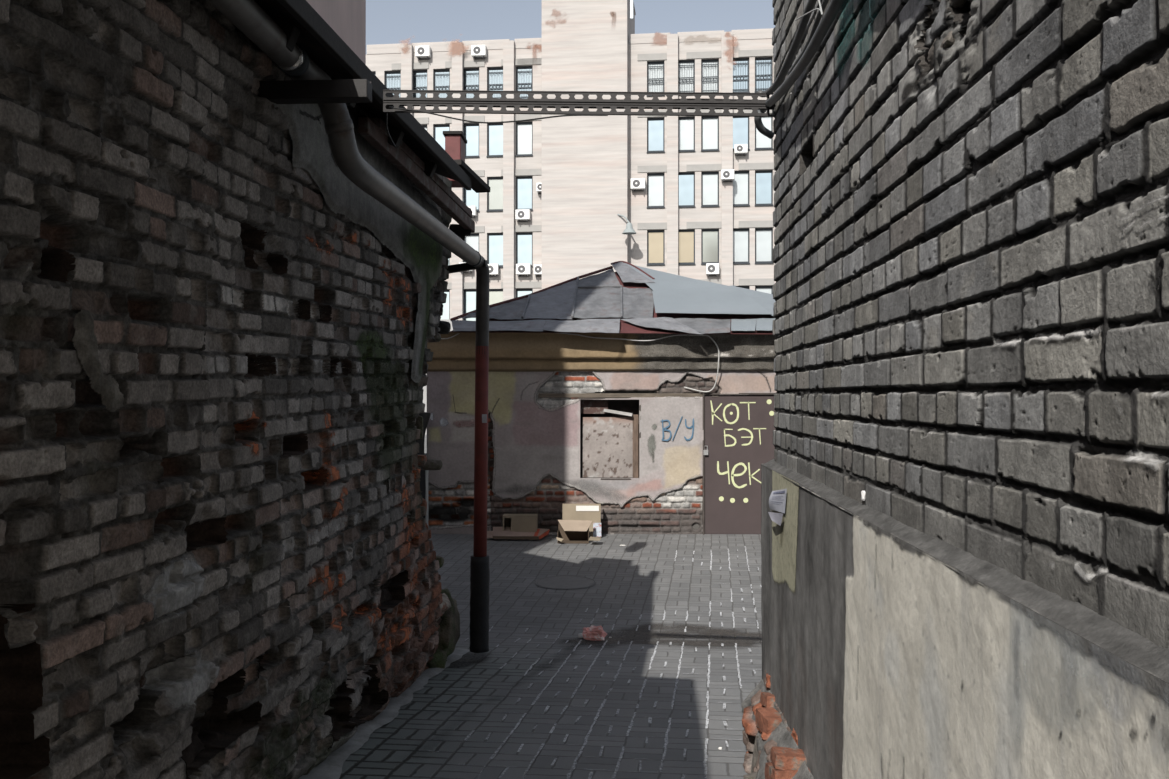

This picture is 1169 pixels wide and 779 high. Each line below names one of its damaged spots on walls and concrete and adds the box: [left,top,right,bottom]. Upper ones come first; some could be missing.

flaking render [534,371,606,412]
spalling [184,517,228,552]
spalling [281,413,348,518]
flaking render [395,455,703,554]
spalling [307,556,444,653]
spalling [324,664,389,749]